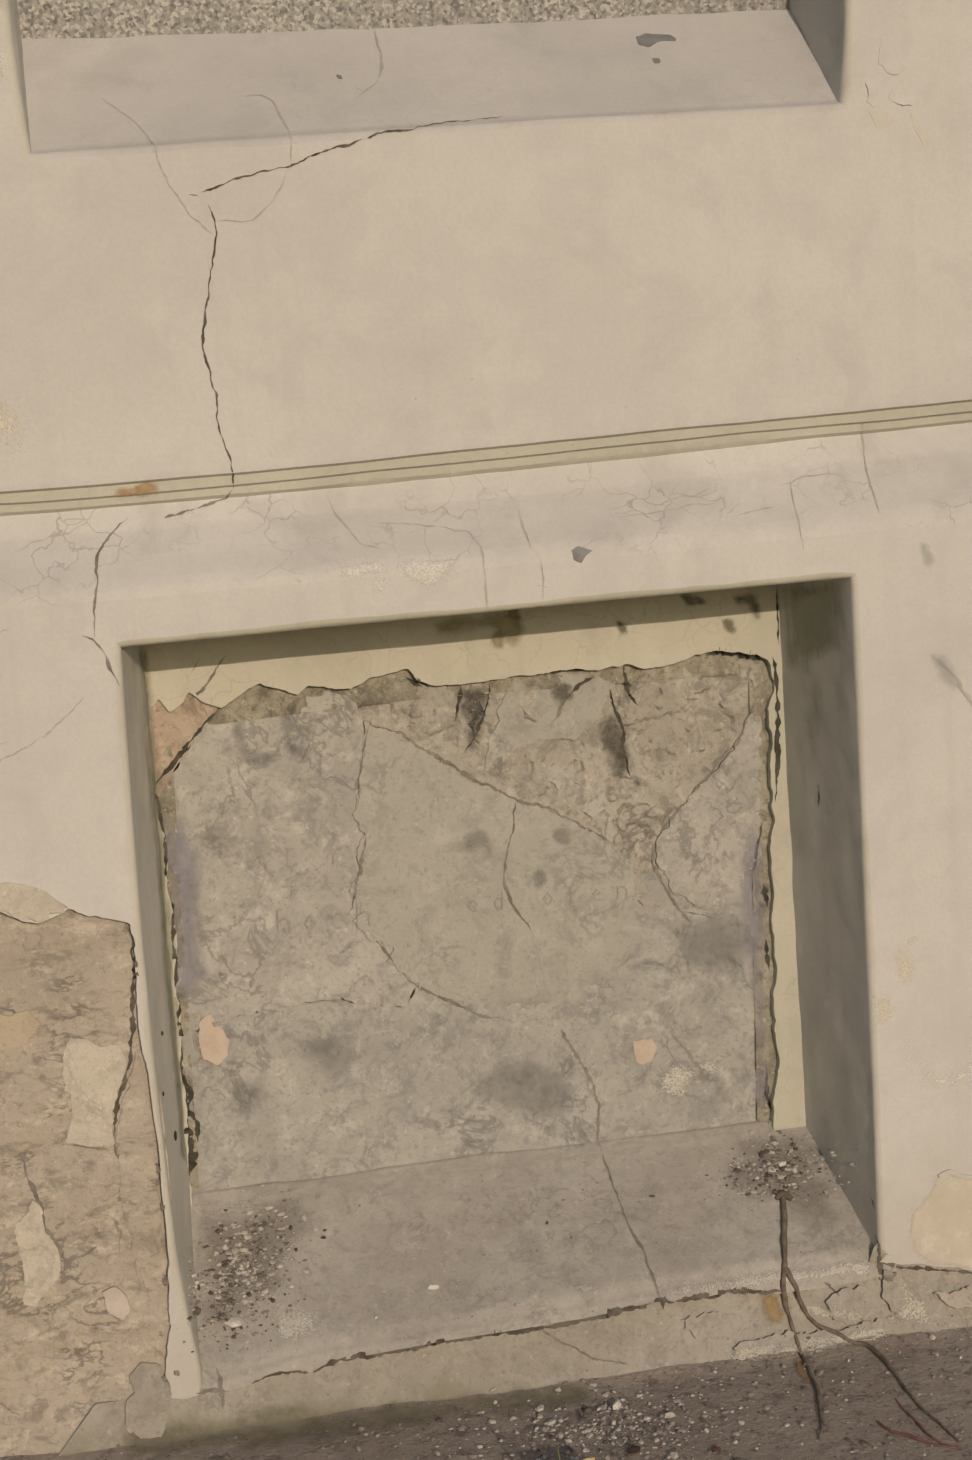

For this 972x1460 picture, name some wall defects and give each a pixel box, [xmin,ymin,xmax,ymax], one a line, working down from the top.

peeling [636,33,676,63]
crack [104,94,504,518]
crack [624,424,879,550]
crack [84,521,124,686]
leakage [443,609,521,646]
crack [551,666,639,776]
crack [350,719,613,1019]
crack [651,697,766,922]
spalling [0,658,767,1457]
crack [196,1029,781,1410]
spalling [681,1269,918,1359]
peeling [909,1169,972,1309]